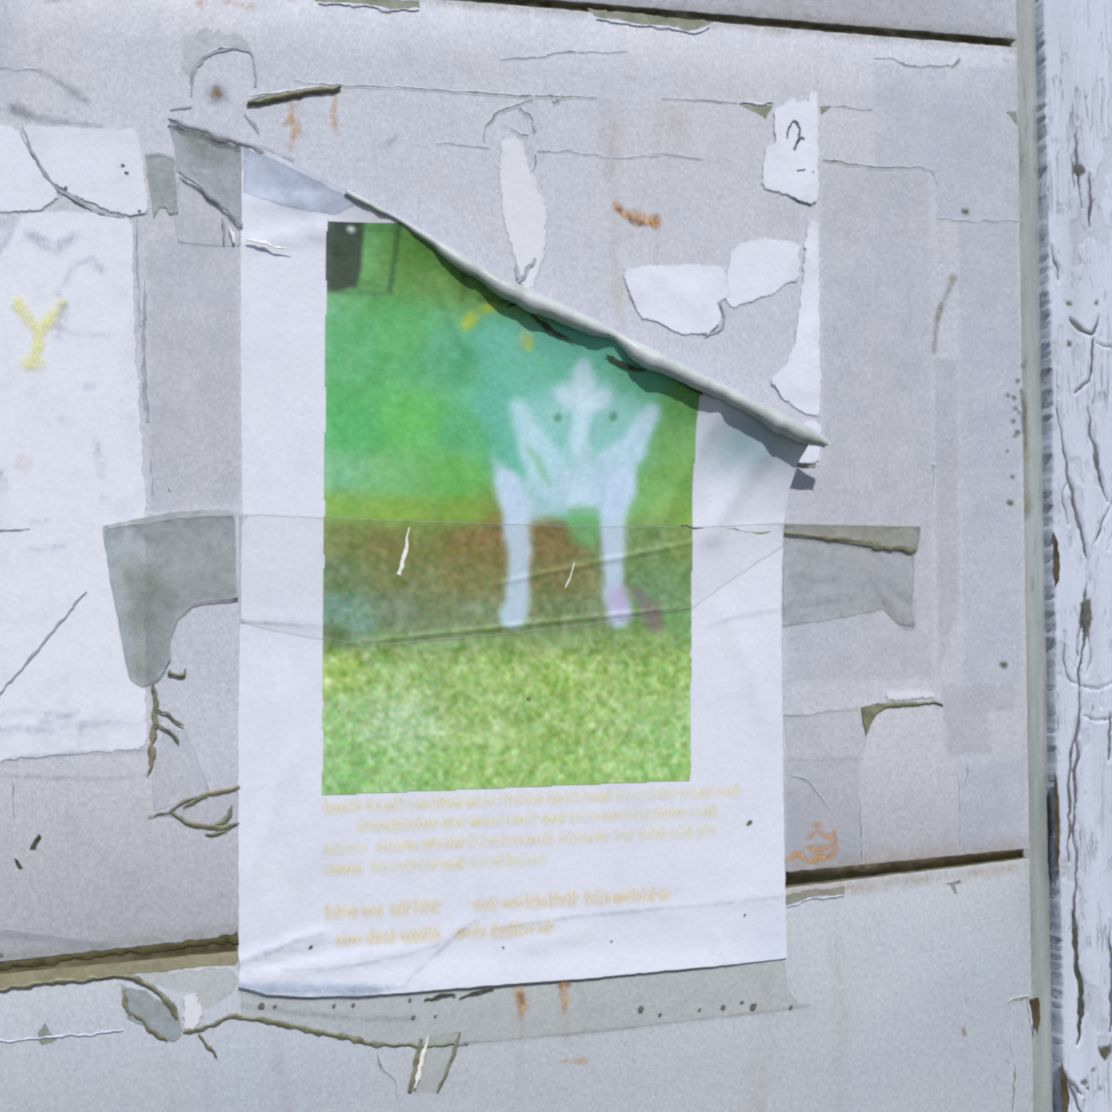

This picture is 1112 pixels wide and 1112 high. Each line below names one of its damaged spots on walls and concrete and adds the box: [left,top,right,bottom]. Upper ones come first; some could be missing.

corrosion [615,204,659,227]
peeling [0,1023,123,1045]
crack [376,1052,399,1102]
peeling [1061,1059,1070,1112]